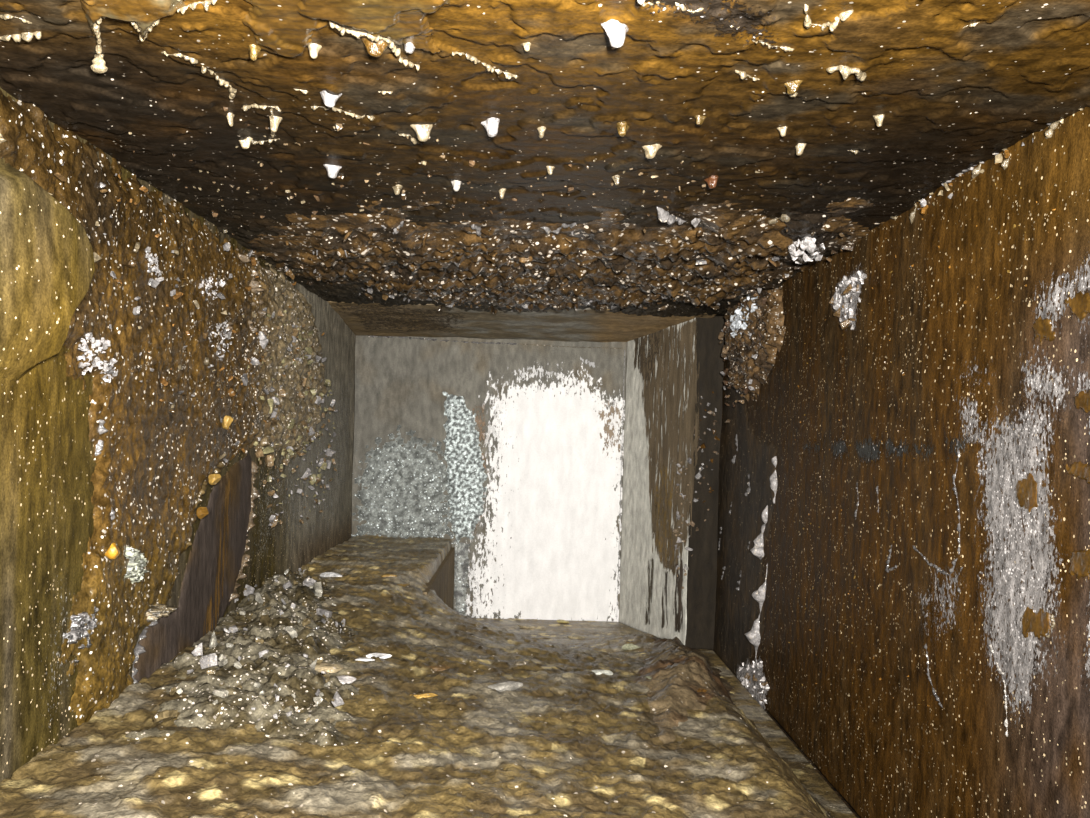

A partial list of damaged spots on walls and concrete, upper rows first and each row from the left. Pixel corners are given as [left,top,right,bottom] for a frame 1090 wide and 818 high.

crack [891,108,1083,224]
spalling [768,211,838,264]
water stain [1034,257,1090,330]
water stain [0,90,885,746]
spalling [132,454,261,683]
water stain [913,565,964,638]
water stain [954,345,1090,724]